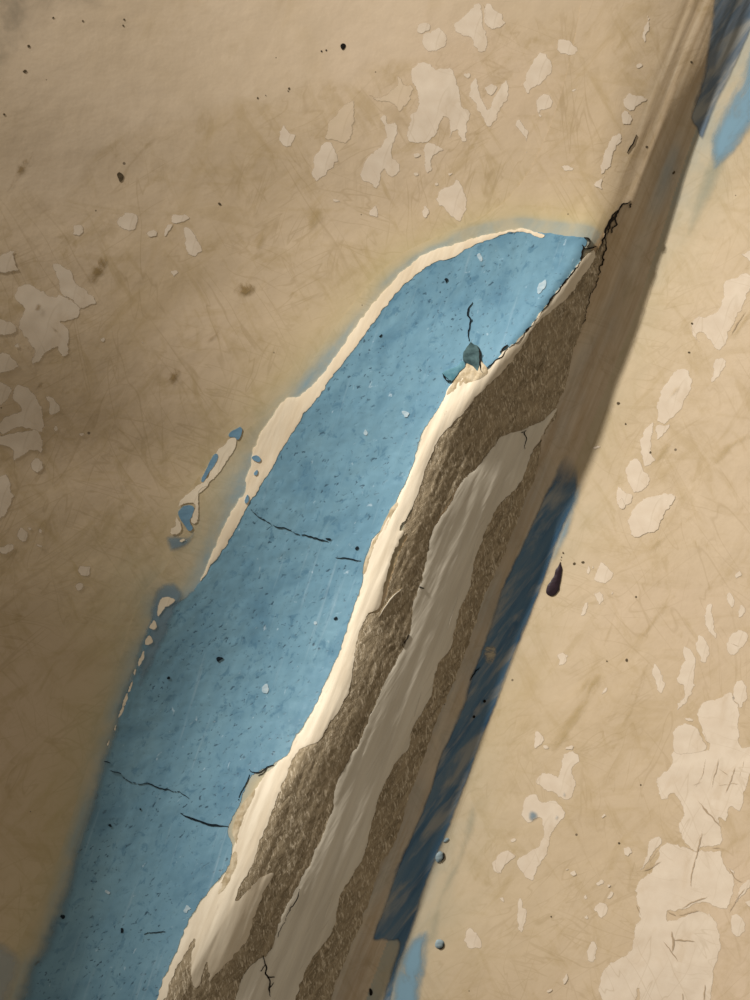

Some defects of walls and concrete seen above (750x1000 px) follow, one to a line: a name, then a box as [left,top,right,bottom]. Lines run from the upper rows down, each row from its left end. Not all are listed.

peeling [360,3,508,188]
peeling [422,173,467,221]
peeling [594,93,647,189]
peeling [0,263,96,473]
crack [487,201,631,368]
peeling [691,273,750,382]
crack [253,512,359,561]
peeling [23,223,613,1000]
peeling [616,369,692,537]
crack [104,761,228,827]
peeling [598,604,750,1000]
crack [261,955,274,997]